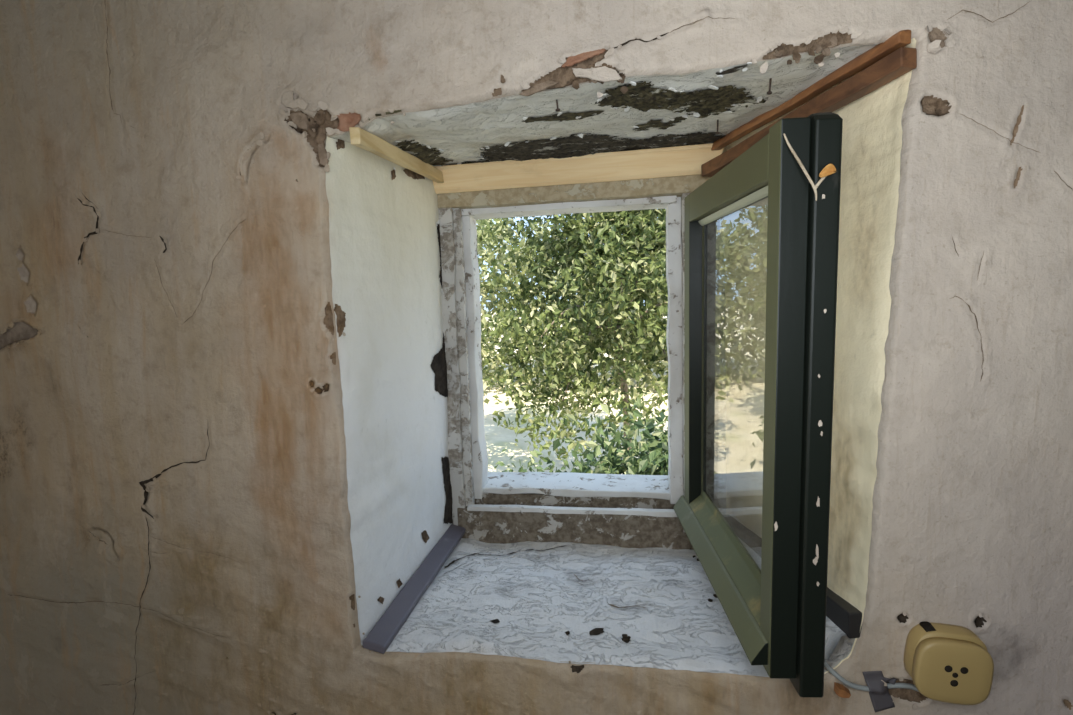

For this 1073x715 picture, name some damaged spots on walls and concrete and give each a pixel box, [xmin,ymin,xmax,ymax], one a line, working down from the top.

peeling [926,25,955,54]
spalling [279,91,406,172]
peeling [391,23,864,180]
spalling [921,95,952,116]
crack [77,192,244,323]
spalling [0,294,42,350]
crack [8,430,240,714]